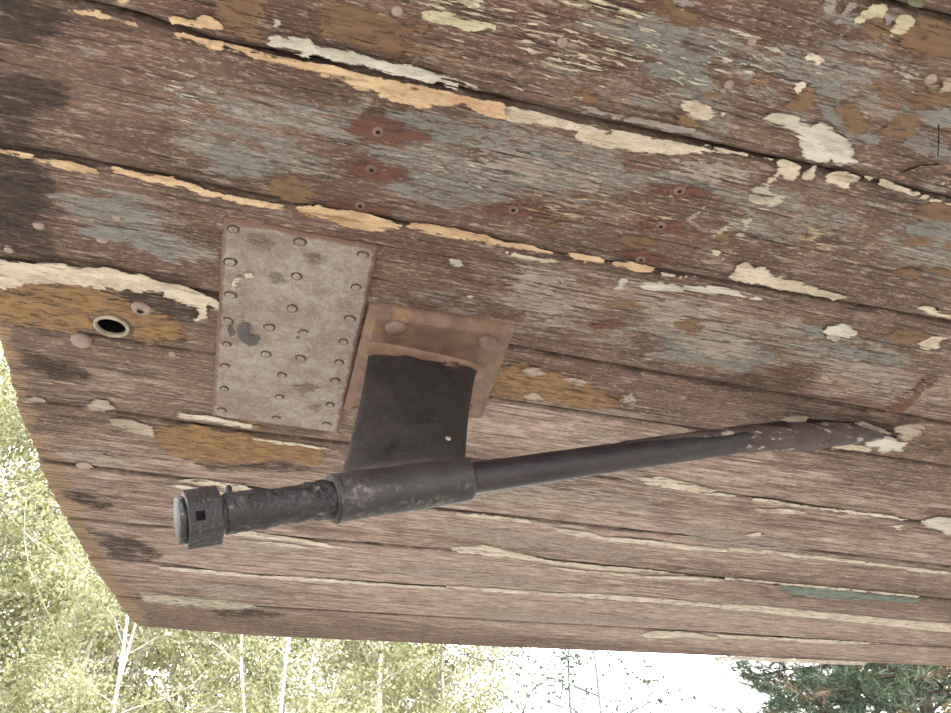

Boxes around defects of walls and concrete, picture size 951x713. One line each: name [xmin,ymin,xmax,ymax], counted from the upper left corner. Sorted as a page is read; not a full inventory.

peeling [68,9,111,20]
peeling [146,0,951,222]
peeling [0,149,871,309]
peeling [0,246,220,345]
peeling [823,324,857,342]
peeling [86,399,329,467]
peeling [822,421,925,454]
peeling [173,479,253,495]
peeling [638,477,908,530]
peeling [224,531,352,549]
peeling [451,545,920,598]
peeling [159,567,951,633]